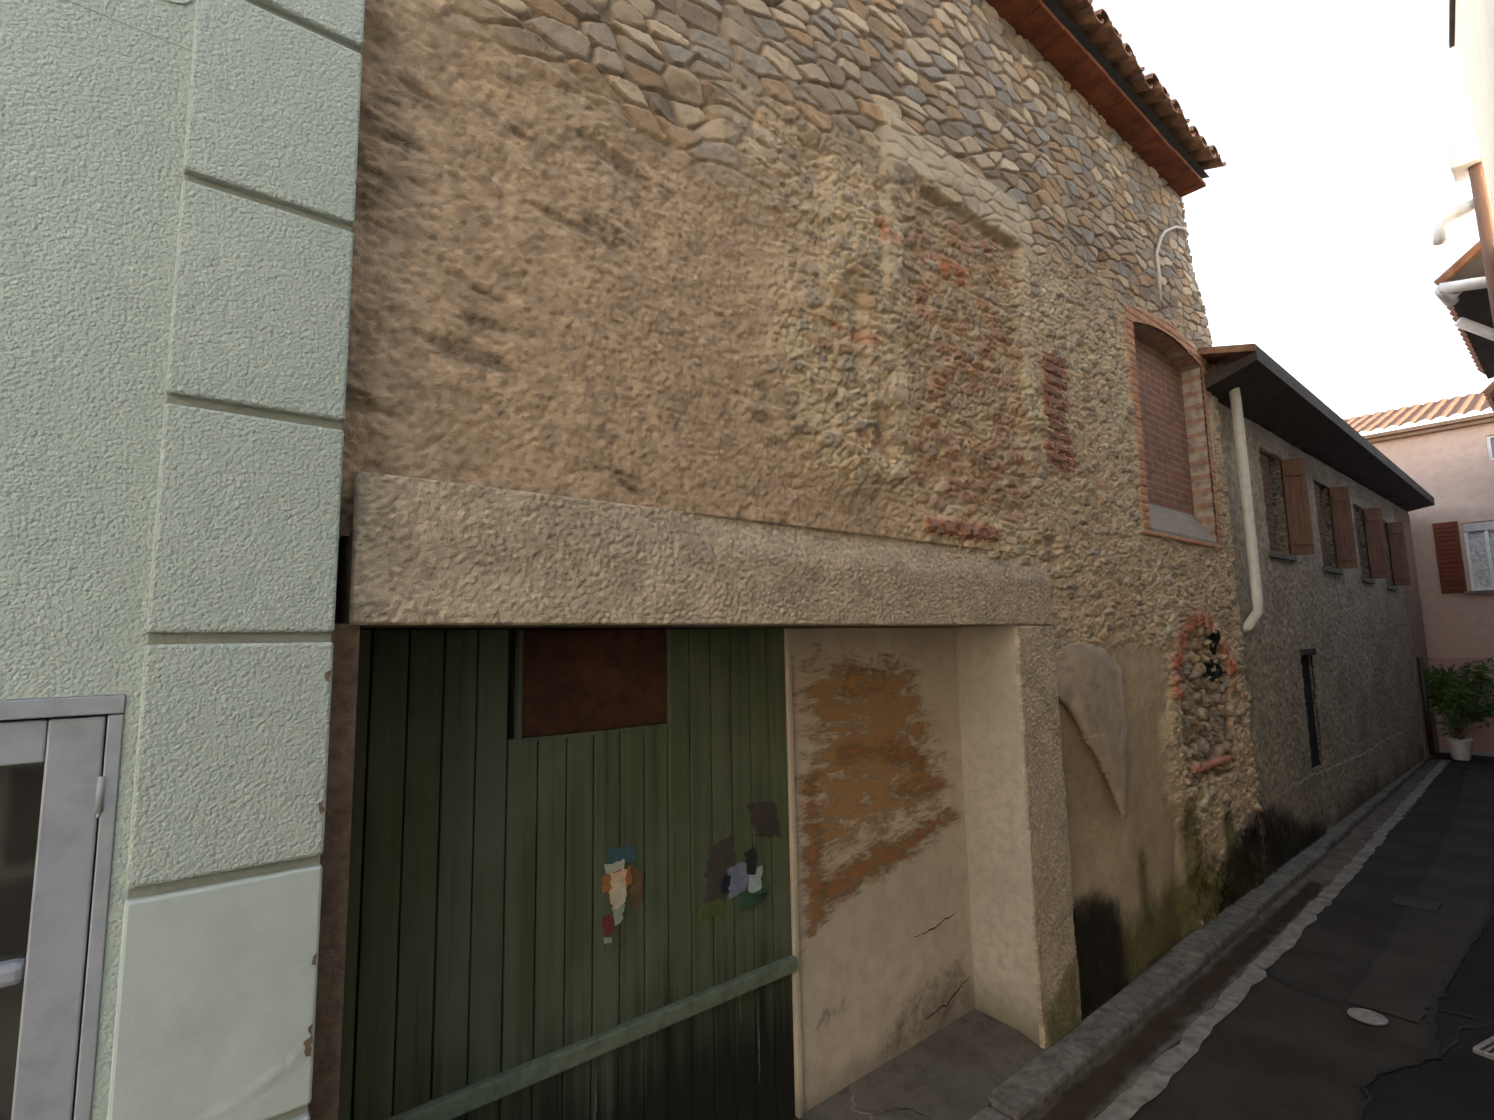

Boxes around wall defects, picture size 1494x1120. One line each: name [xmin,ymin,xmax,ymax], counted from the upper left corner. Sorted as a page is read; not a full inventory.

crack [915,911,958,937]
crack [923,976,971,1021]
damp [1041,882,1323,1120]